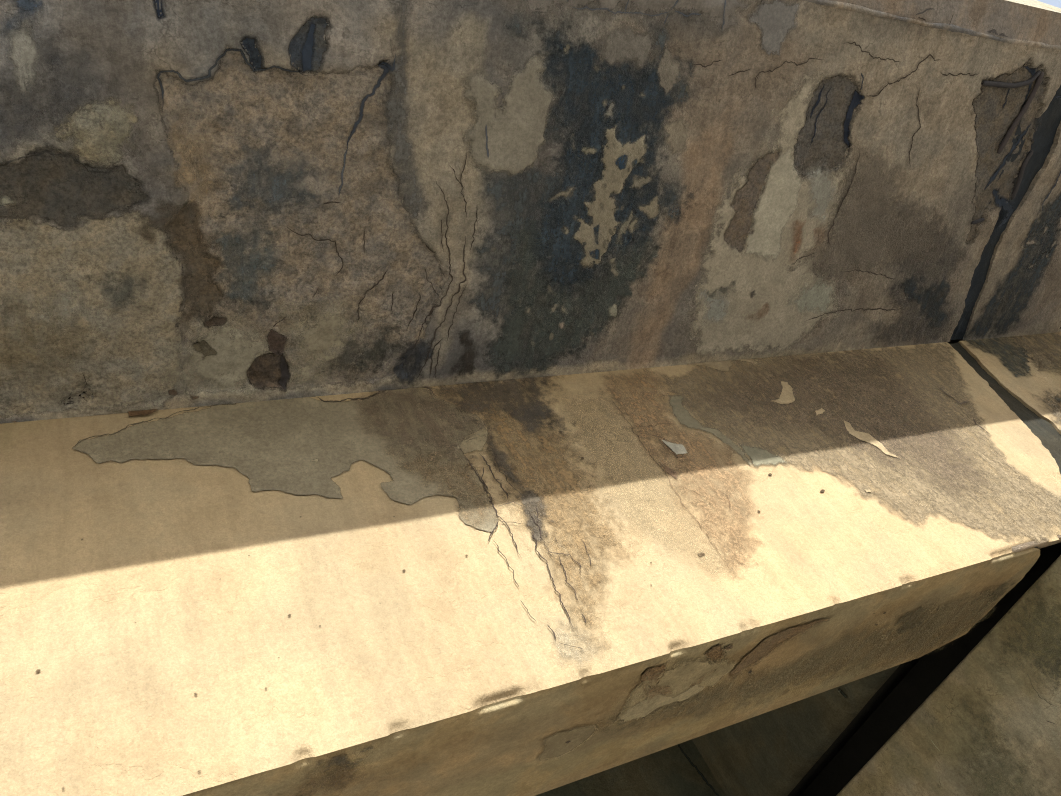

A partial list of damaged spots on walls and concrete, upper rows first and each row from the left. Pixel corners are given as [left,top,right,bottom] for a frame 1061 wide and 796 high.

crack [324,54,396,204]
crack [525,0,747,35]
spalling [724,150,779,252]
crack [692,58,822,88]
spalling [793,73,865,177]
crack [844,42,977,167]
spalling [965,61,1048,244]
spalling [0,16,499,532]
leakage [393,342,433,384]
crack [357,153,478,382]
leakage [429,11,694,624]
peeling [618,619,829,721]